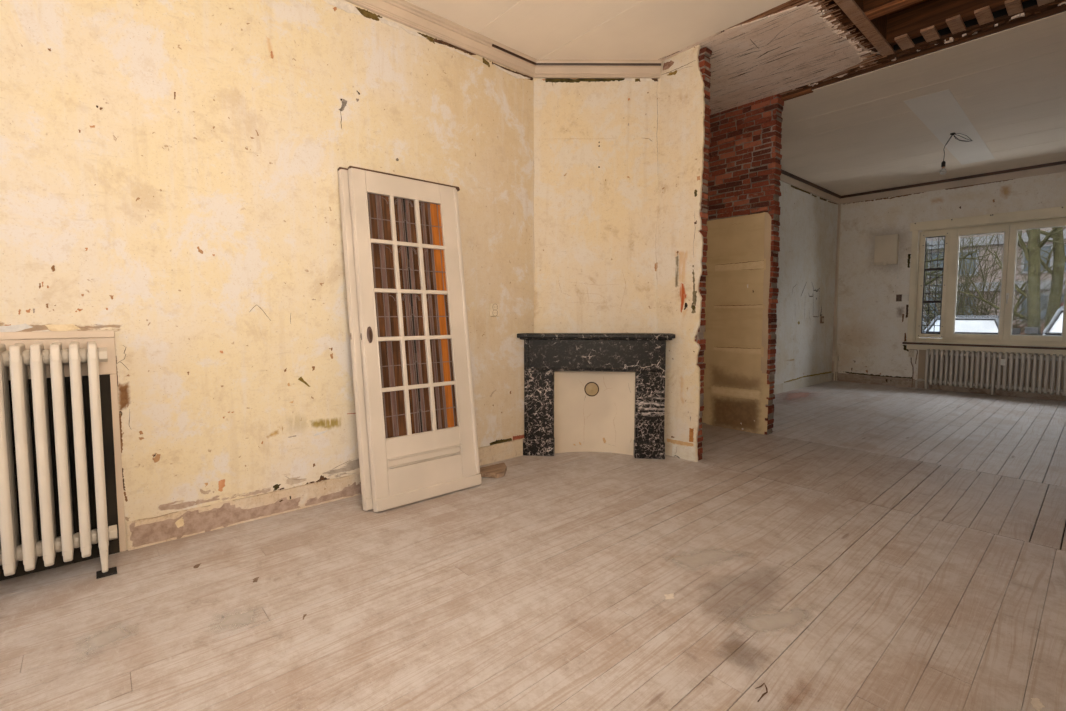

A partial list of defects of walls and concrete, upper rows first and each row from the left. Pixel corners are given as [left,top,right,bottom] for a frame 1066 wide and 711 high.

spalling [323,0,534,82]
peeling [37,264,56,290]
peeling [0,293,128,337]
peeling [690,217,698,314]
spalling [119,413,362,551]